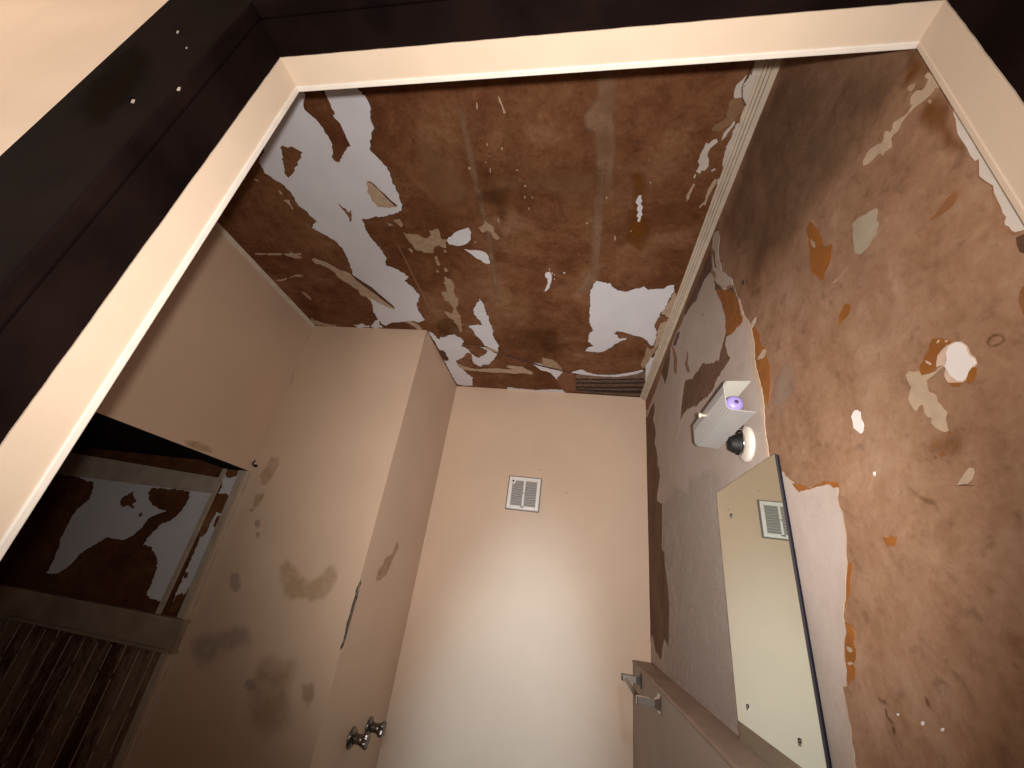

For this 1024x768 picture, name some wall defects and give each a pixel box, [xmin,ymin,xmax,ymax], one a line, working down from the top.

peeling [693,121,735,178]
peeling [948,101,1024,236]
peeling [254,88,500,386]
peeling [852,208,879,255]
peeling [507,358,576,393]
spalling [919,338,977,387]
peeling [851,410,864,434]
flaking render [585,229,769,737]
peeling [957,467,975,485]
peeling [46,469,239,612]
crack [340,580,361,650]
flaking render [782,472,857,768]